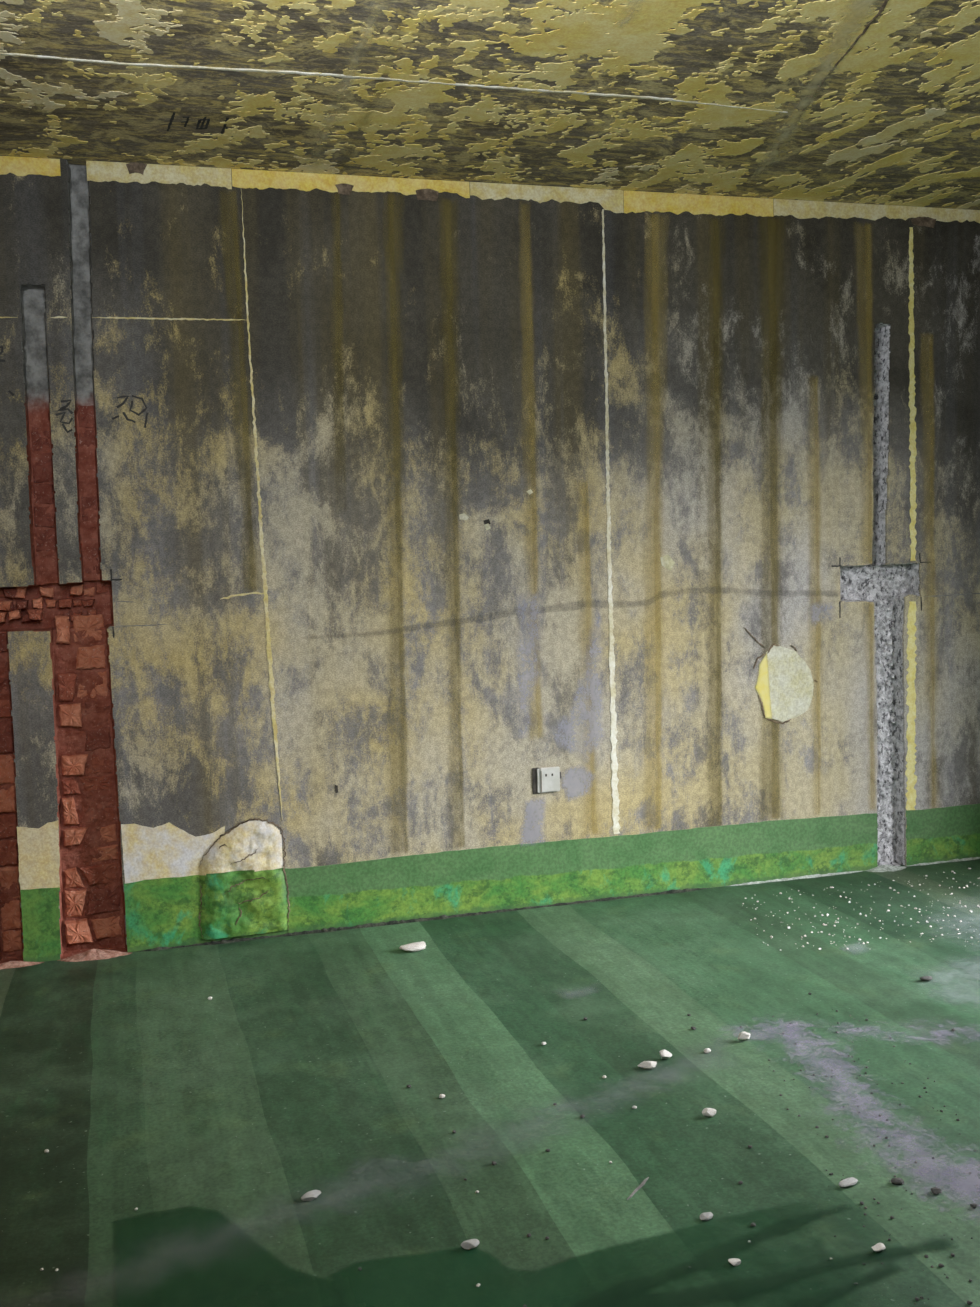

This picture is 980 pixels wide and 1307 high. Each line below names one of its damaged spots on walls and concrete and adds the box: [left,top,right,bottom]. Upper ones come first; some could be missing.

crack [0,0,889,175]
peeling [0,0,980,228]
flaking render [459,513,491,531]
flaking render [743,627,817,724]
peeling [16,820,60,890]
peeling [121,823,225,884]